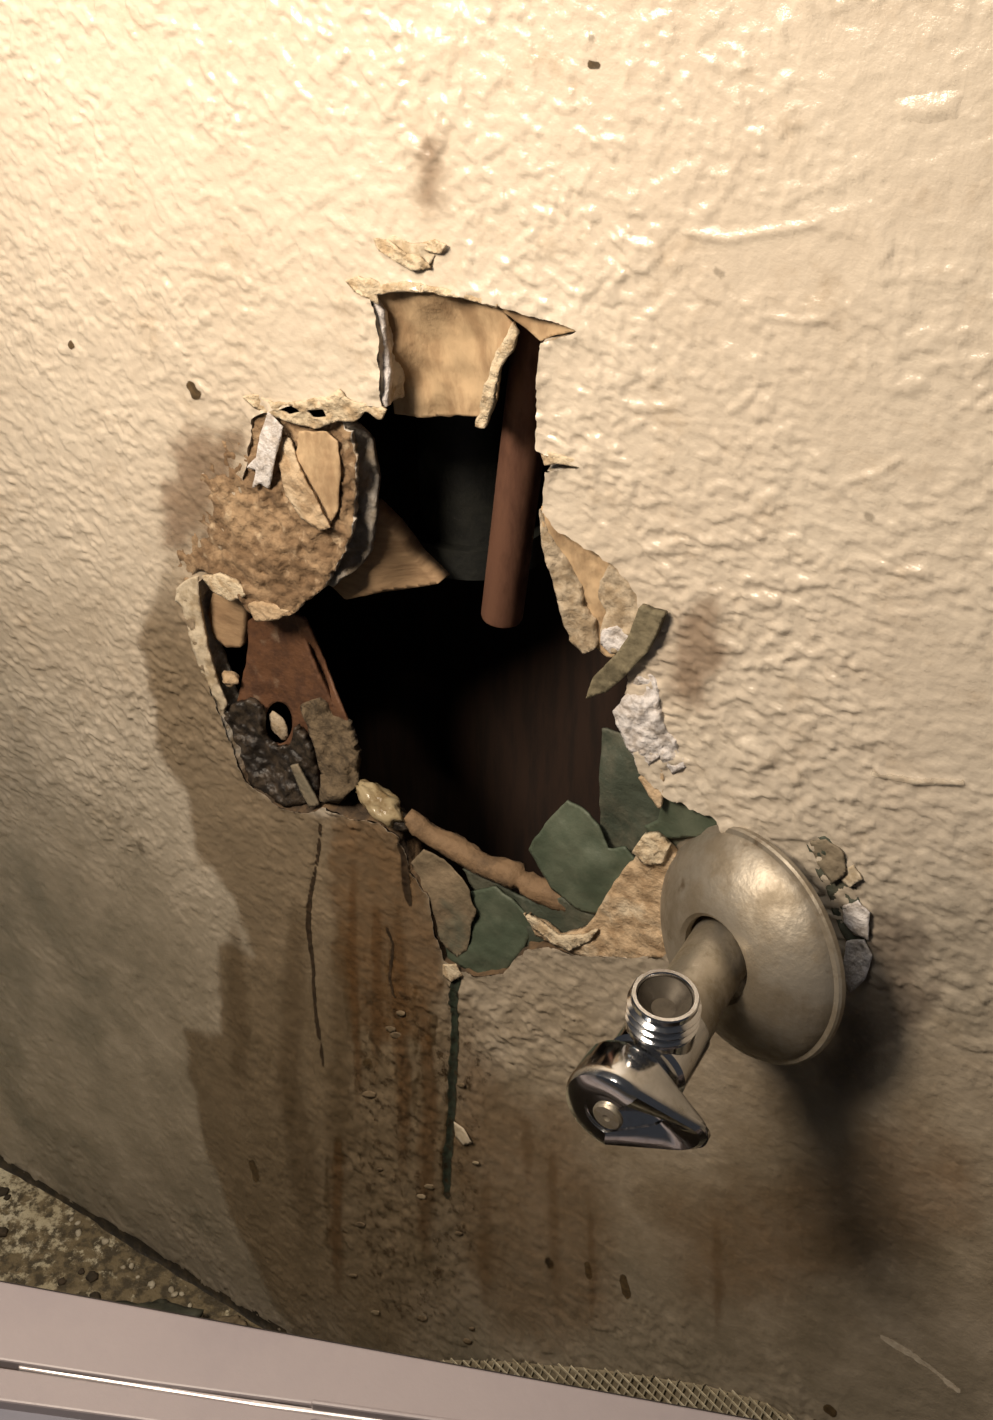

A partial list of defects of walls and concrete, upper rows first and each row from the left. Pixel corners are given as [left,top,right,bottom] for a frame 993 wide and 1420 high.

spalling [175,236,717,977]
water stain [142,615,447,1328]
crack [306,823,324,1066]
crack [442,964,472,1199]
peeling [807,836,872,992]
water stain [619,1274,631,1299]
water stain [814,1404,837,1420]